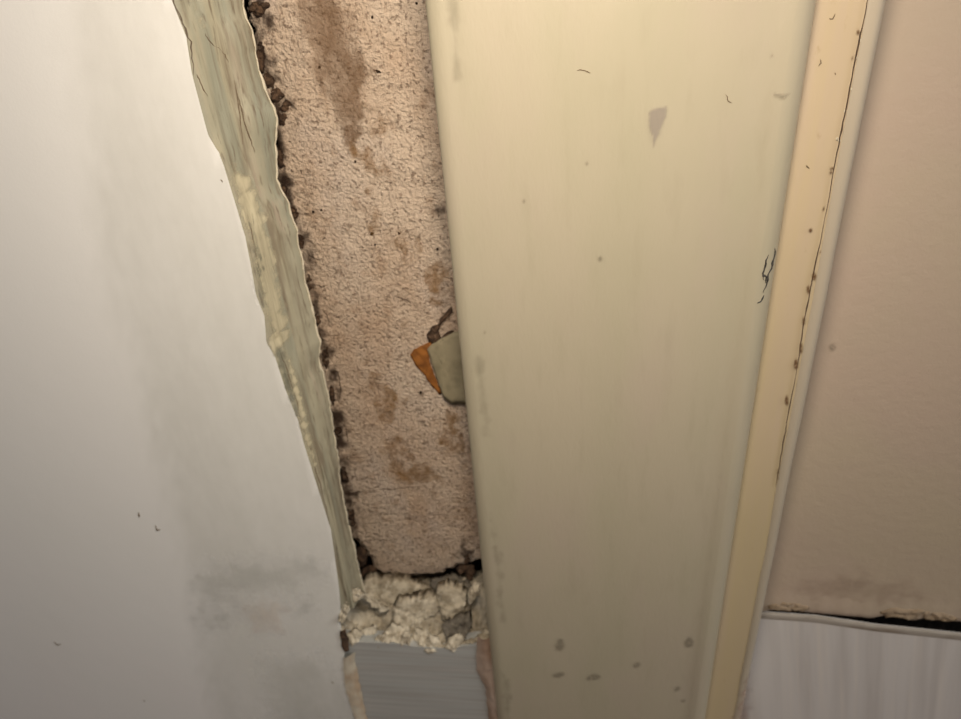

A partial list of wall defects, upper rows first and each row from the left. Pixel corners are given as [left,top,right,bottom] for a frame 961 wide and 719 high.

peeling [172,0,489,654]
flaking render [880,608,958,622]